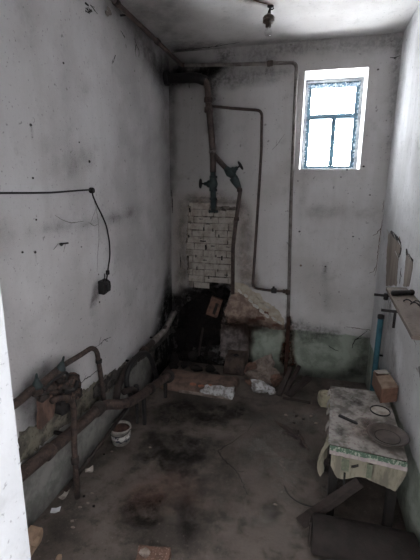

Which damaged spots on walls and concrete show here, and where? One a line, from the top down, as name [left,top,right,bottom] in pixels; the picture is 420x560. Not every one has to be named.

flaking render [386,230,413,287]
rust [280,318,296,368]
flaking render [18,362,127,463]